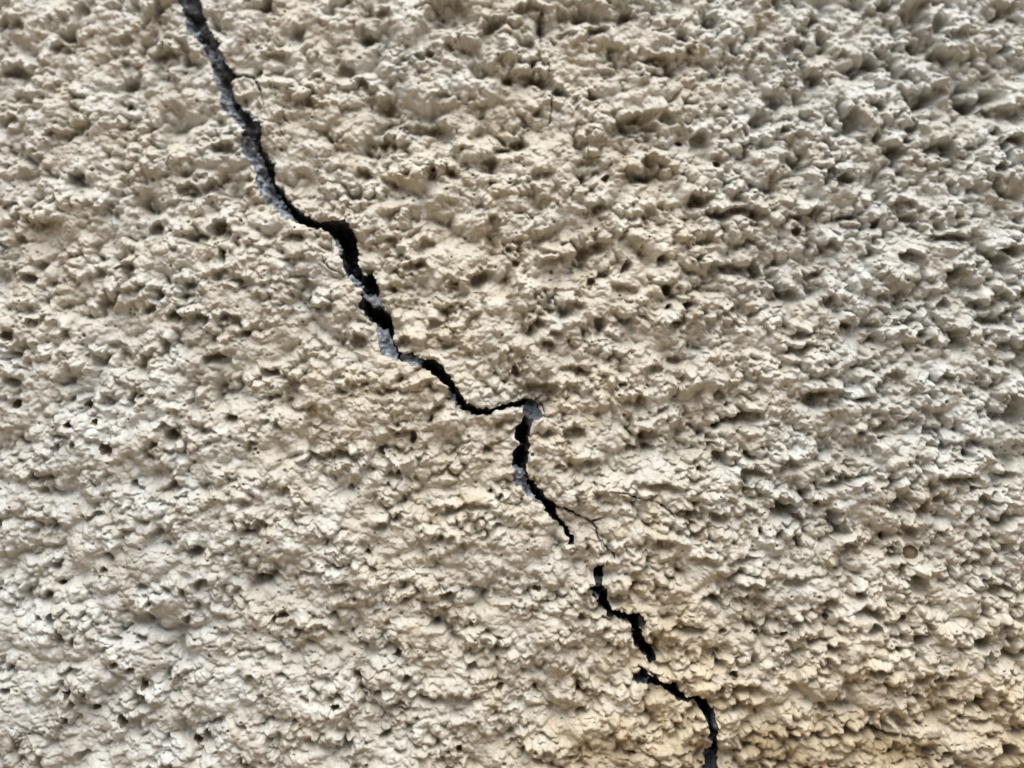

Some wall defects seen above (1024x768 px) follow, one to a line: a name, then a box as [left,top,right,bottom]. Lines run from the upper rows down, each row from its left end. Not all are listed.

crack [178,0,719,768]